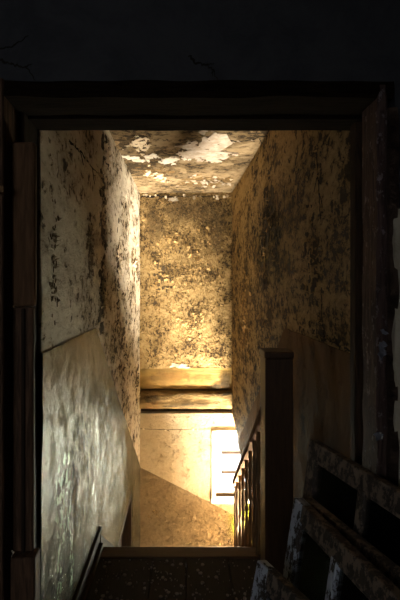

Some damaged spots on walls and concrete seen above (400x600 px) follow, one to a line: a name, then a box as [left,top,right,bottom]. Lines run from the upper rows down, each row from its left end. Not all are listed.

spalling [118,130,239,189]